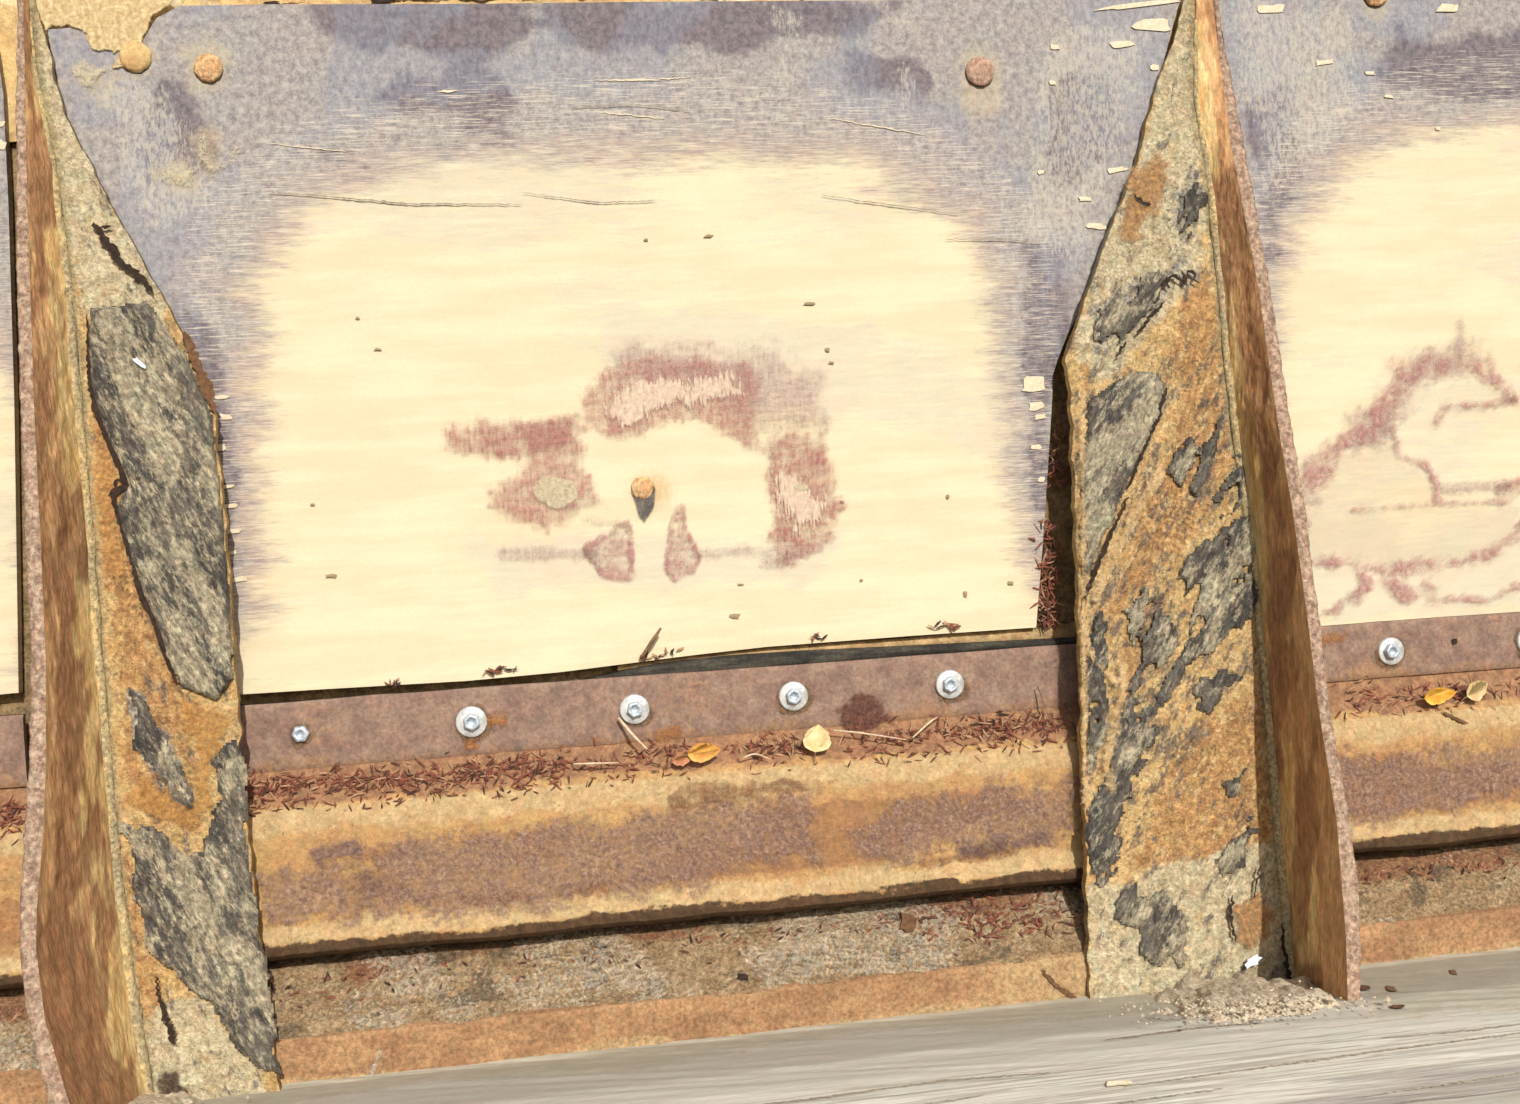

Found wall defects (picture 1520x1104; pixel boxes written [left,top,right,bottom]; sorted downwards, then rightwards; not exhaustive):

rust [290,724,314,748]
rust [455,704,507,750]
rust [629,695,682,741]
rust [776,683,814,714]